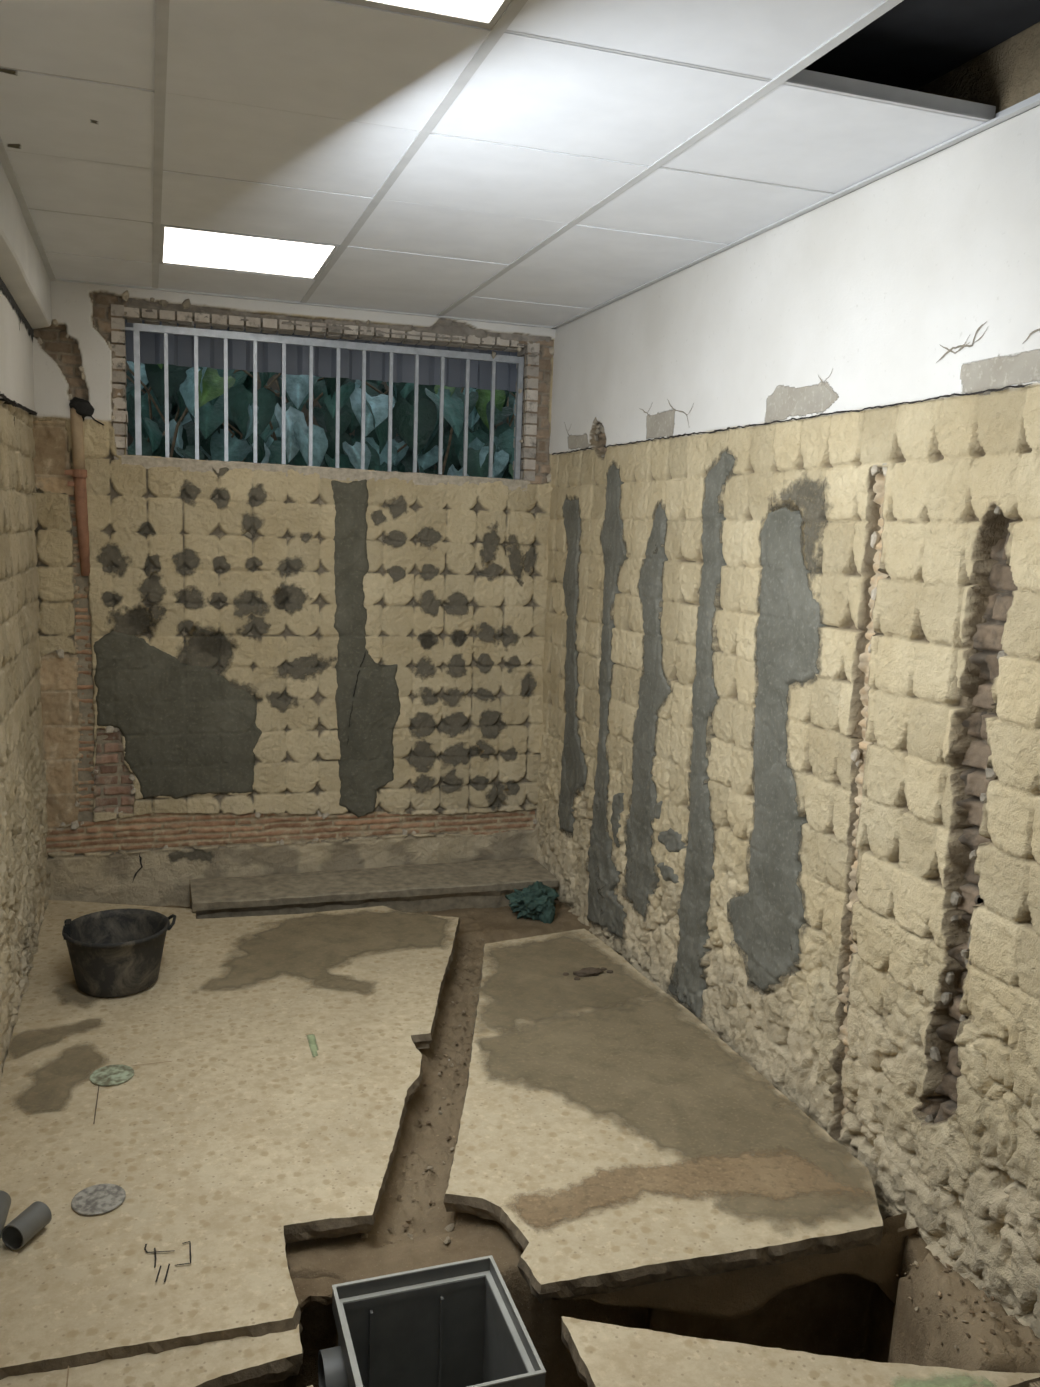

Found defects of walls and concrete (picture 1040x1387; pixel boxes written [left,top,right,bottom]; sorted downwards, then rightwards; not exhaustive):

flaking render [34,319,89,401]
flaking render [90,290,554,484]
peeling [568,417,607,457]
peeling [765,381,839,423]
peeling [960,349,1040,395]
flaking render [45,726,537,854]
water stain [476,448,876,1231]
water stain [202,911,449,993]
water stain [9,982,107,1112]